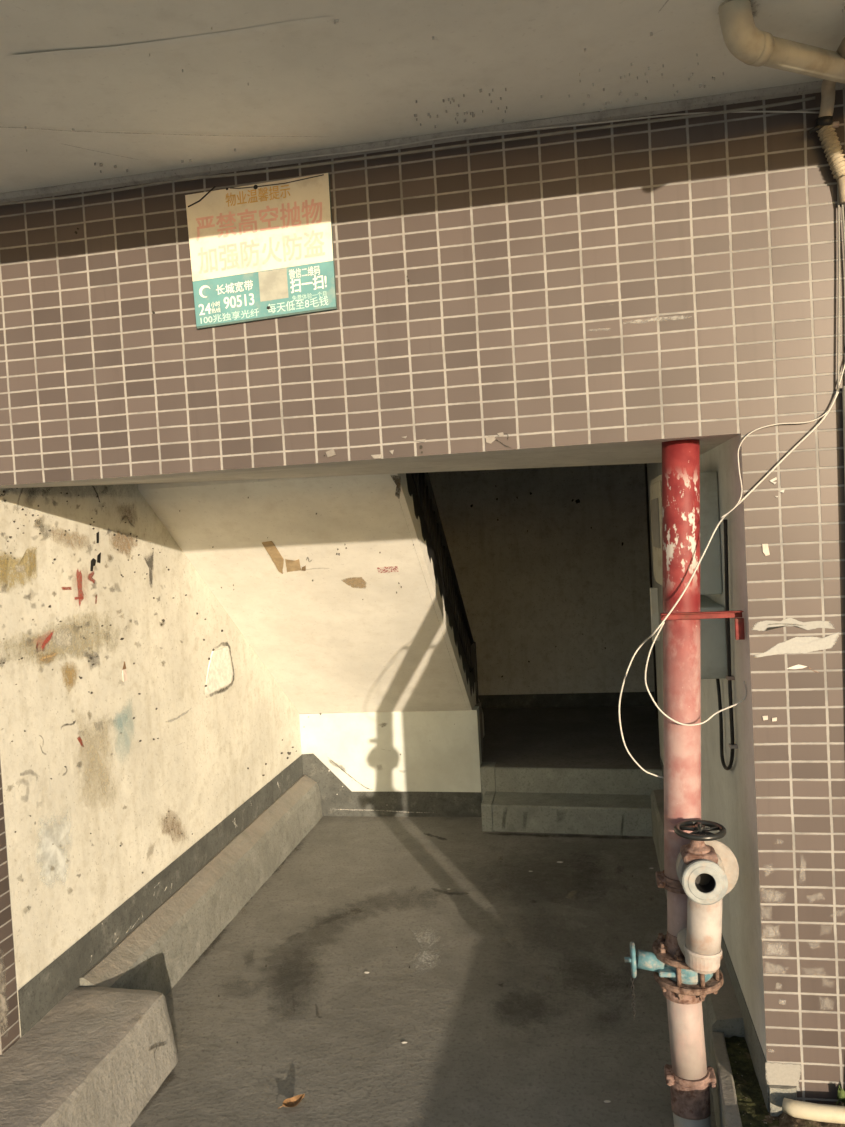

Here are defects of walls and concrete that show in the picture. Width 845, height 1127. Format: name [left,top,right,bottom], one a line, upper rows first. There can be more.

peeling [105,508,187,600]
peeling [262,537,313,581]